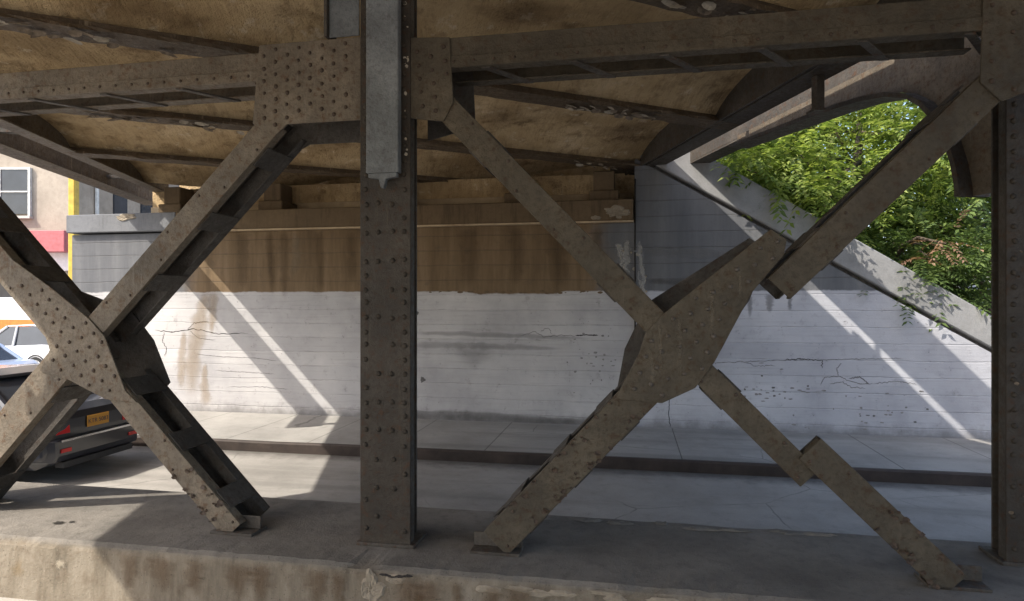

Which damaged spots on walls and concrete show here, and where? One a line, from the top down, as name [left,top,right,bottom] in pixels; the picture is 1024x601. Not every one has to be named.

peeling [0,20,119,48]
damp [617,242,647,293]
crack [158,321,283,389]
crack [714,358,915,389]
spalling [361,568,413,601]